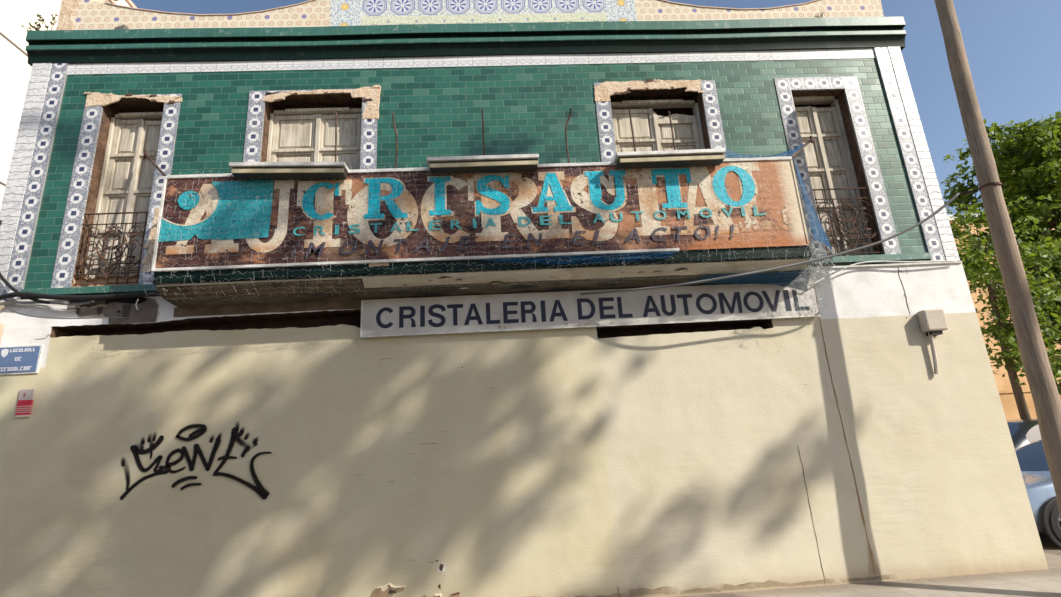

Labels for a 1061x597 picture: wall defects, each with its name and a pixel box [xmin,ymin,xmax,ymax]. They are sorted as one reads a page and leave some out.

spalling [83,92,182,107]
spalling [261,85,381,119]
spalling [594,79,704,102]
crack [812,276,875,574]
crack [798,447,826,581]
flaking render [370,583,405,597]
peeling [423,560,460,597]